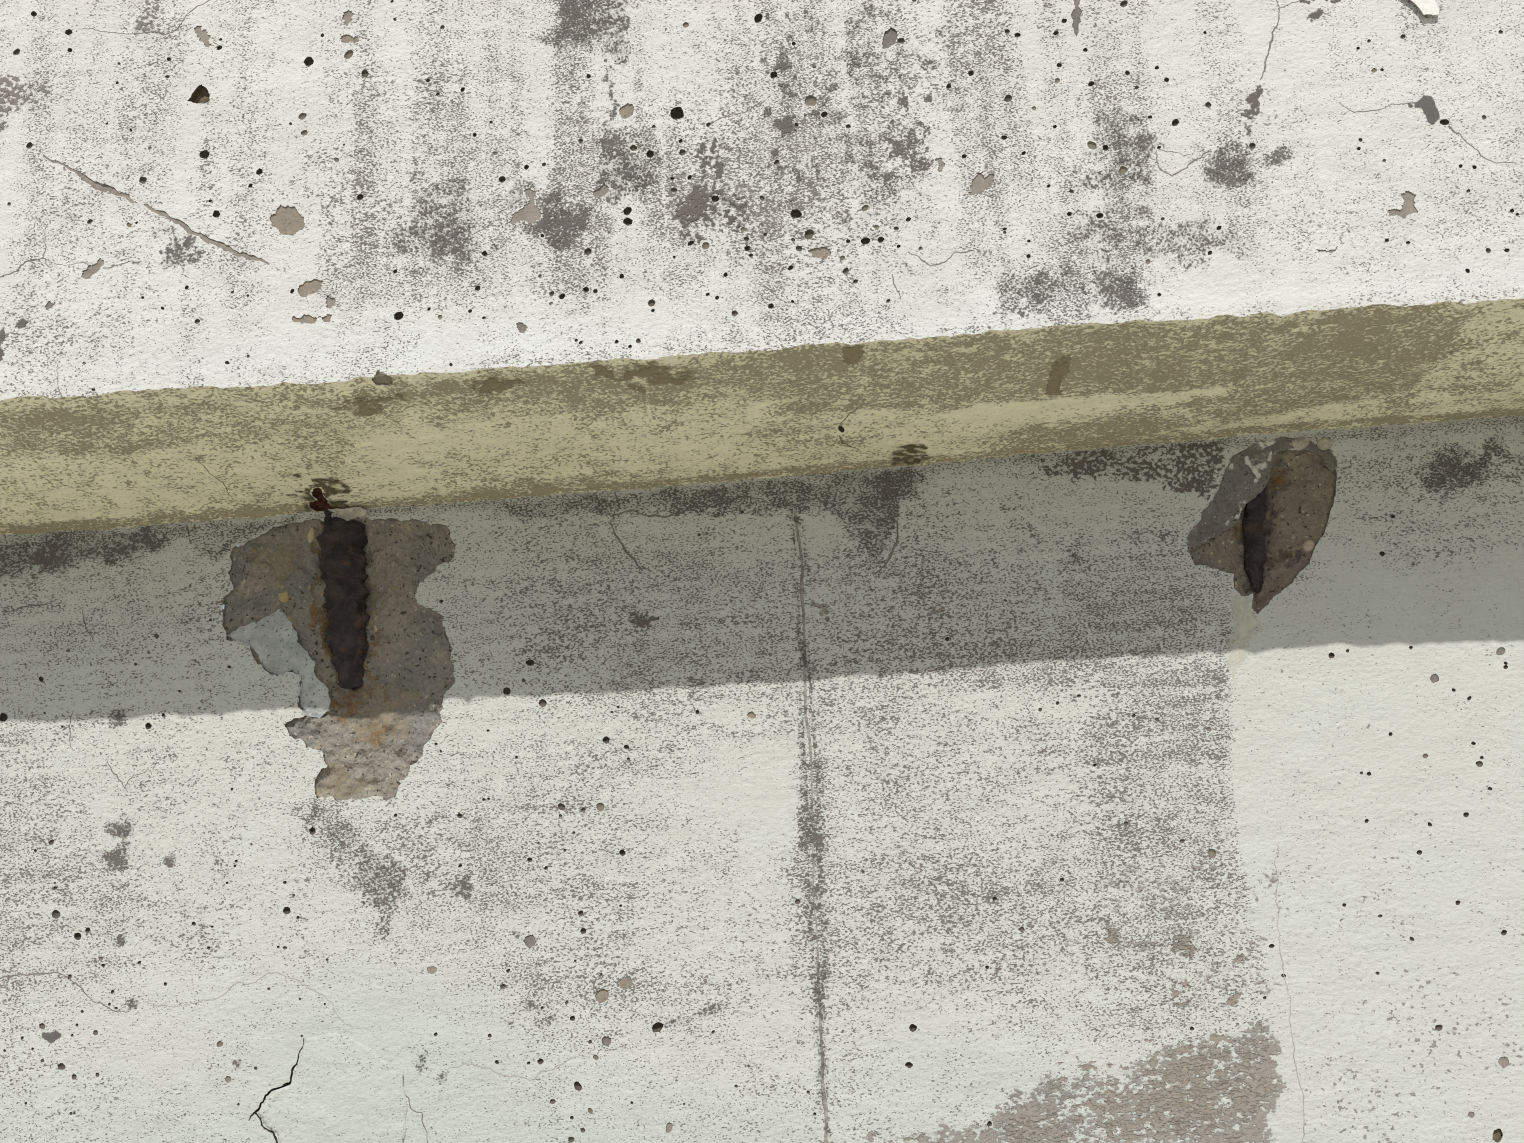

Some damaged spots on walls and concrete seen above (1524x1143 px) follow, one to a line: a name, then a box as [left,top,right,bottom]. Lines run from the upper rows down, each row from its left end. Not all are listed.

corrosion [287,474,351,513]
spalling [1187,436,1337,614]
spalling [222,487,456,801]
crack [0,972,352,1027]
crack [248,1038,304,1143]
crack [403,1075,428,1143]